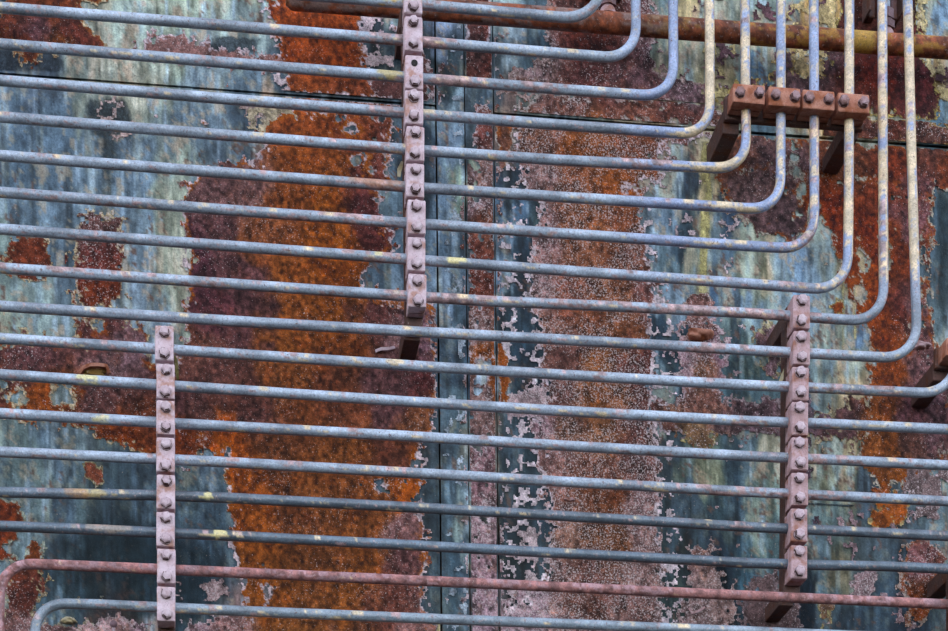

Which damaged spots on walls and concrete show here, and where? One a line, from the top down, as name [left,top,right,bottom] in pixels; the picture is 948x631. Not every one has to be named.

corrosion [0,0,108,69]
corrosion [257,0,392,106]
corrosion [835,0,877,31]
corrosion [0,208,157,453]
peeling [500,272,542,367]
corrosion [460,24,948,631]
corrosion [0,498,152,631]
peeling [506,418,541,438]
peeling [500,519,552,546]
peeling [502,485,552,508]
peeling [506,449,550,473]
peeling [654,503,686,587]